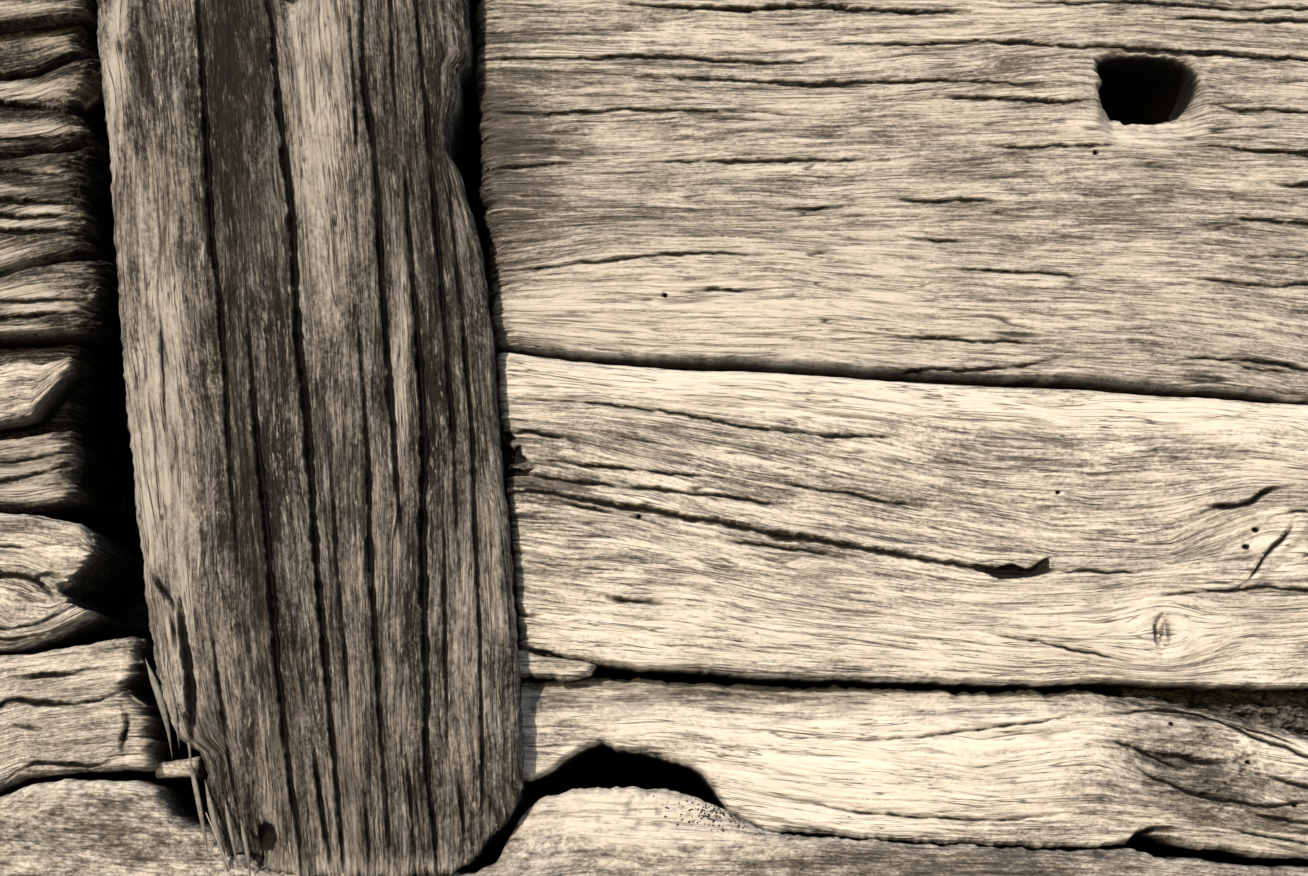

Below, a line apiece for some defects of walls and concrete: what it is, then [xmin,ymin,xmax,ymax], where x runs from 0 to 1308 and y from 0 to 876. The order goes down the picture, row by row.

crack [195,0,484,864]
crack [609,597,652,605]
crack [511,399,1030,573]
crack [1063,567,1140,575]
crack [1161,487,1308,596]
crack [865,709,1308,845]